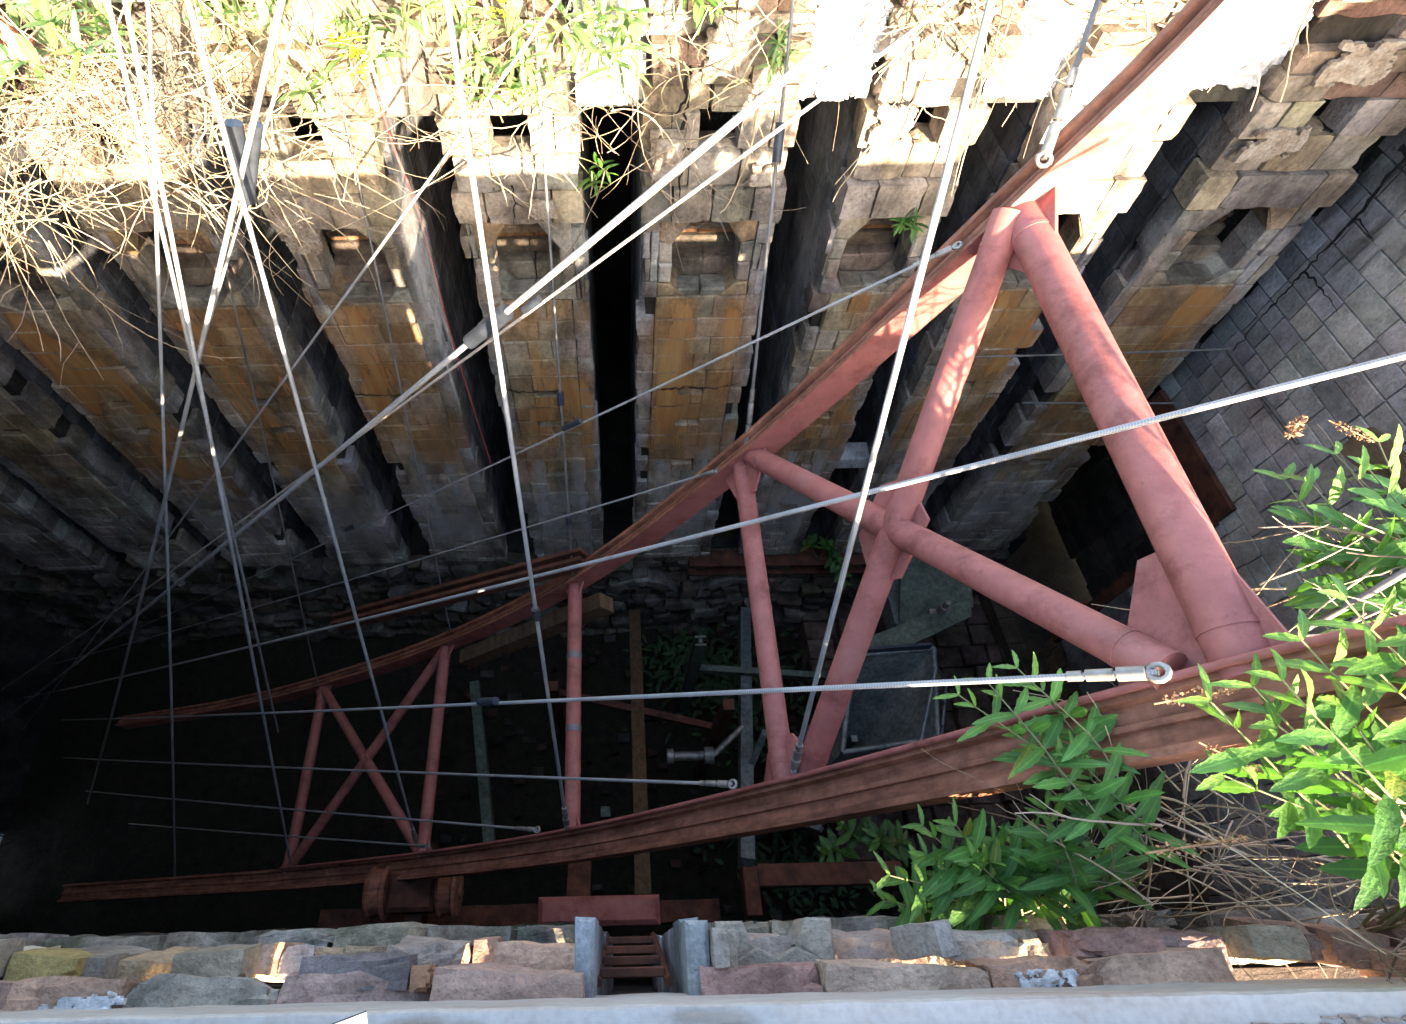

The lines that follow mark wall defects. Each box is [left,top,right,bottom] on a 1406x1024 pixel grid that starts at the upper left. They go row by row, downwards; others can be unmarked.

peeling [980,0,1095,100]
peeling [1194,0,1321,91]
spalling [1311,39,1406,89]
spalling [1232,124,1313,163]
peeling [1251,1014,1406,1024]